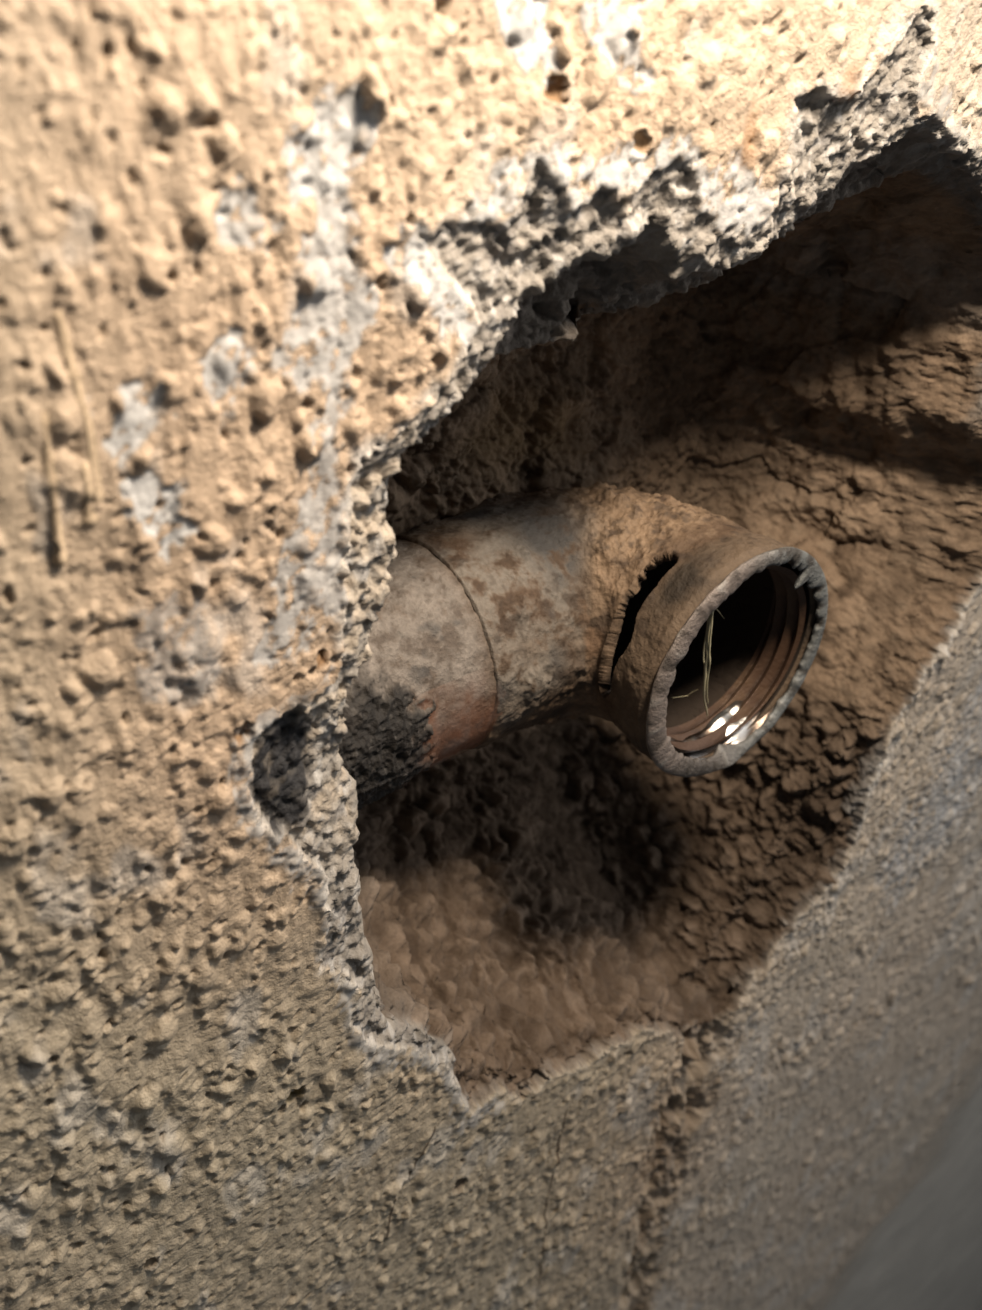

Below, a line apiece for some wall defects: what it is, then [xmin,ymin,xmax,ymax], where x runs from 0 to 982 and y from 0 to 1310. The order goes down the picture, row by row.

peeling [214,174,283,255]
spalling [233,0,982,1115]